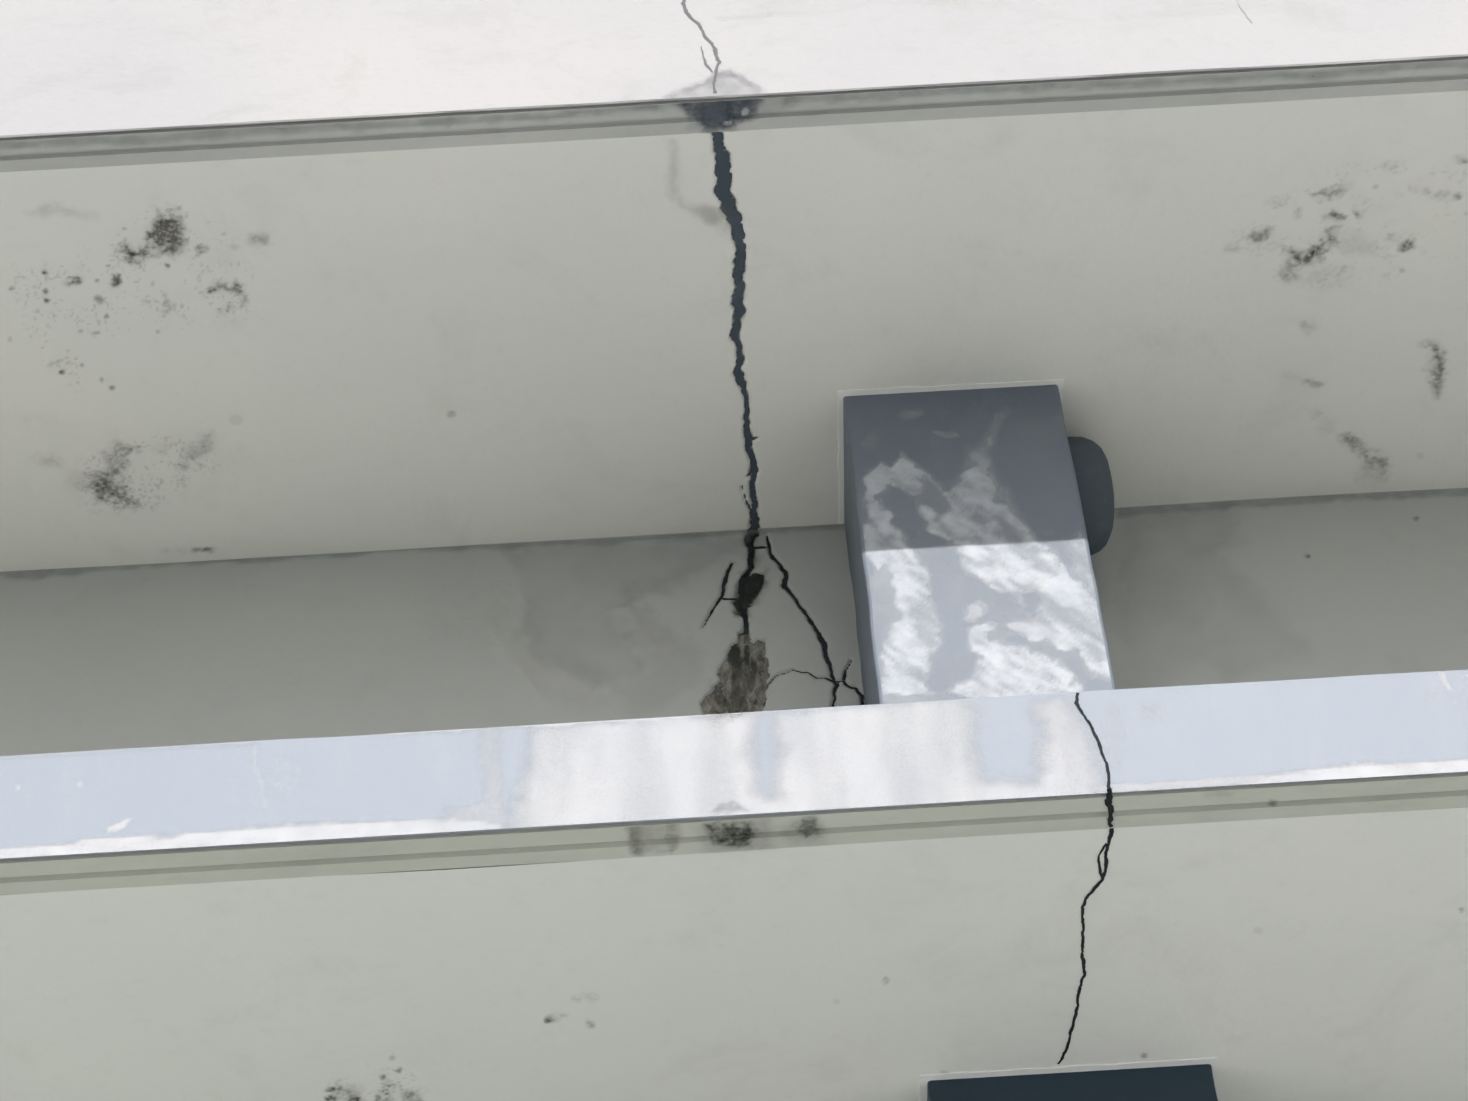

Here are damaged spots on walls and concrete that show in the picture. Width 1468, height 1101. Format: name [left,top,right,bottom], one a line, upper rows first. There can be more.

crack [681,0,721,93]
leakage [96,469,123,499]
mould [128,219,182,258]
peeling [0,457,1468,859]
crack [702,132,864,707]
crack [1057,692,1114,1064]